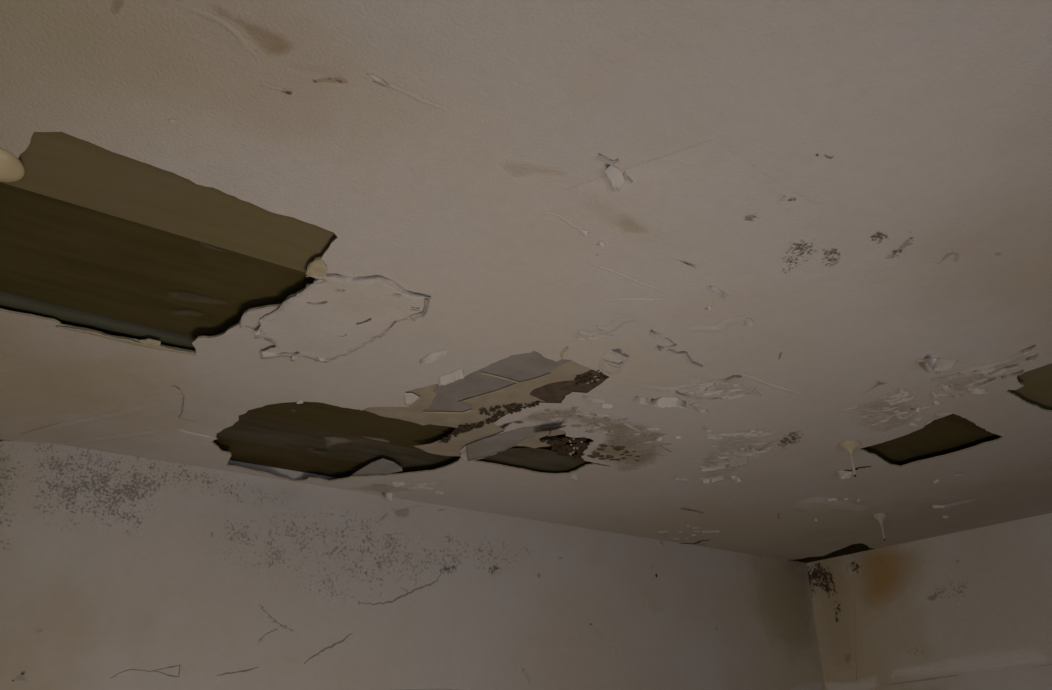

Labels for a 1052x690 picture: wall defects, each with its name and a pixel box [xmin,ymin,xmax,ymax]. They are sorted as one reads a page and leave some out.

peeling [254,274,431,363]
spalling [364,347,682,470]
damp [34,445,246,532]
damp [284,509,510,590]
damp [761,549,919,664]